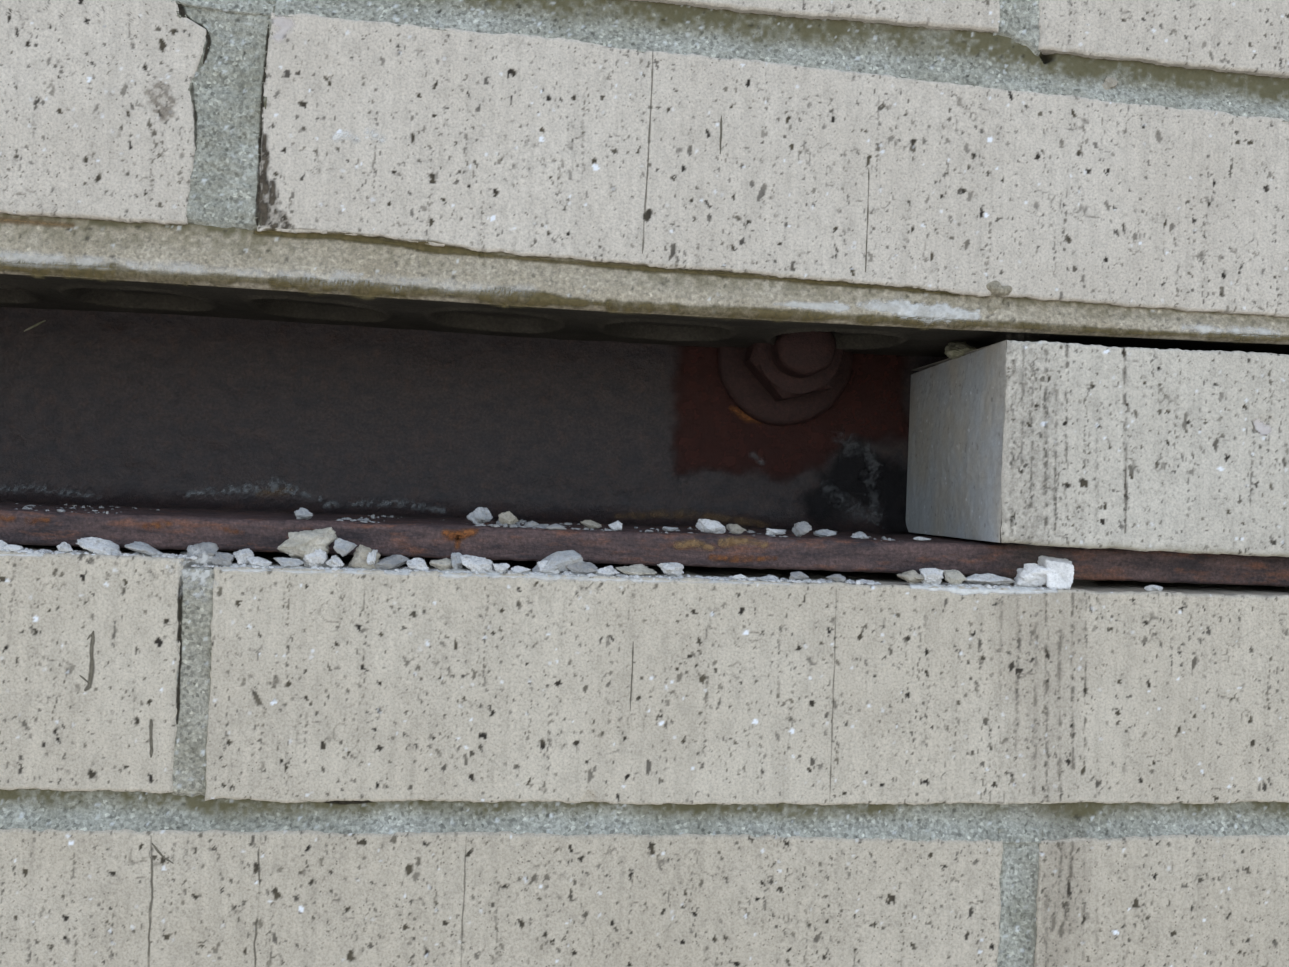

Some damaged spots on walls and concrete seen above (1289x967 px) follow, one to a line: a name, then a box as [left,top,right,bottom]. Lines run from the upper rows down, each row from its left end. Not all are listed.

peeling [806,441,931,541]
corrosion [442,529,477,549]
corrosion [675,538,767,562]